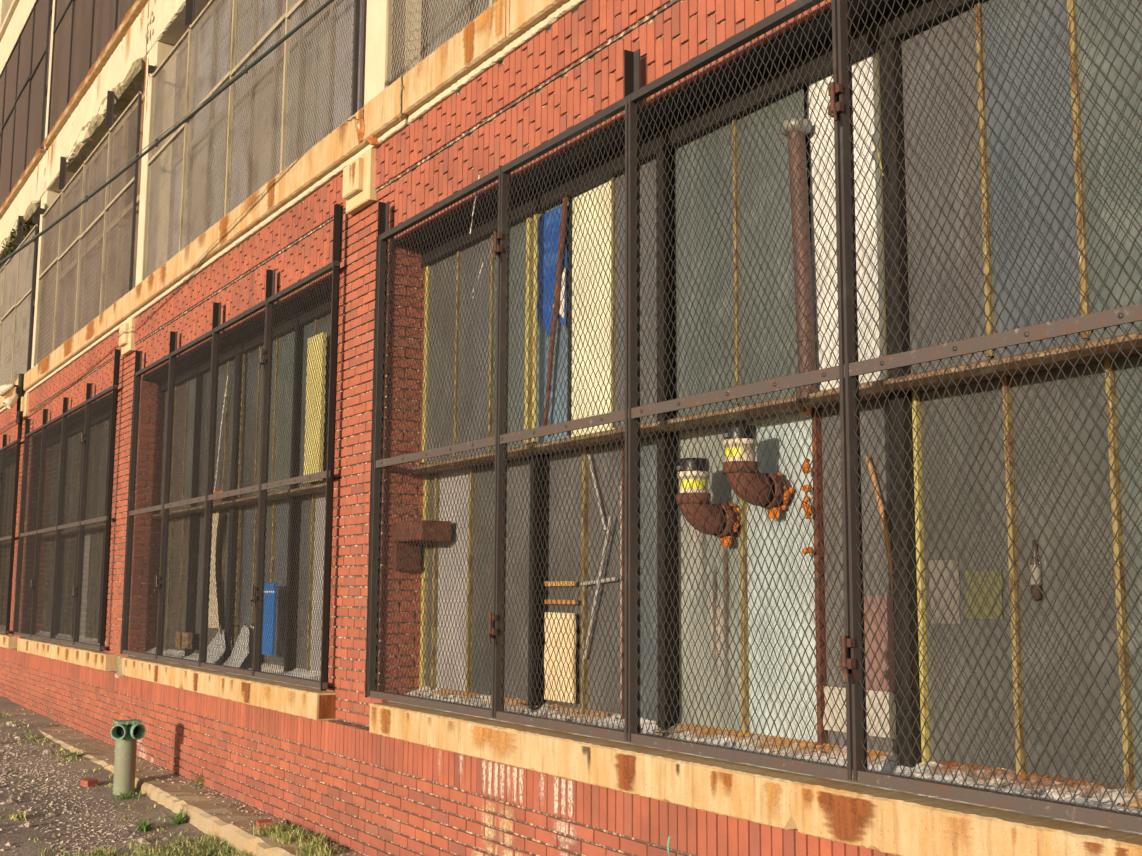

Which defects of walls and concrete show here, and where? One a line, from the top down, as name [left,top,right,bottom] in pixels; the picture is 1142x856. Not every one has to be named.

corrosion [463,0,502,62]
corrosion [247,178,275,209]
corrosion [185,671,250,703]
corrosion [319,695,336,719]
corrosion [372,707,389,733]
corrosion [674,723,841,752]
corrosion [616,754,635,790]
corrosion [710,772,730,790]
damp [475,760,524,856]
damp [541,775,573,856]
corrosion [803,789,873,842]
corrosion [1085,842,1101,853]